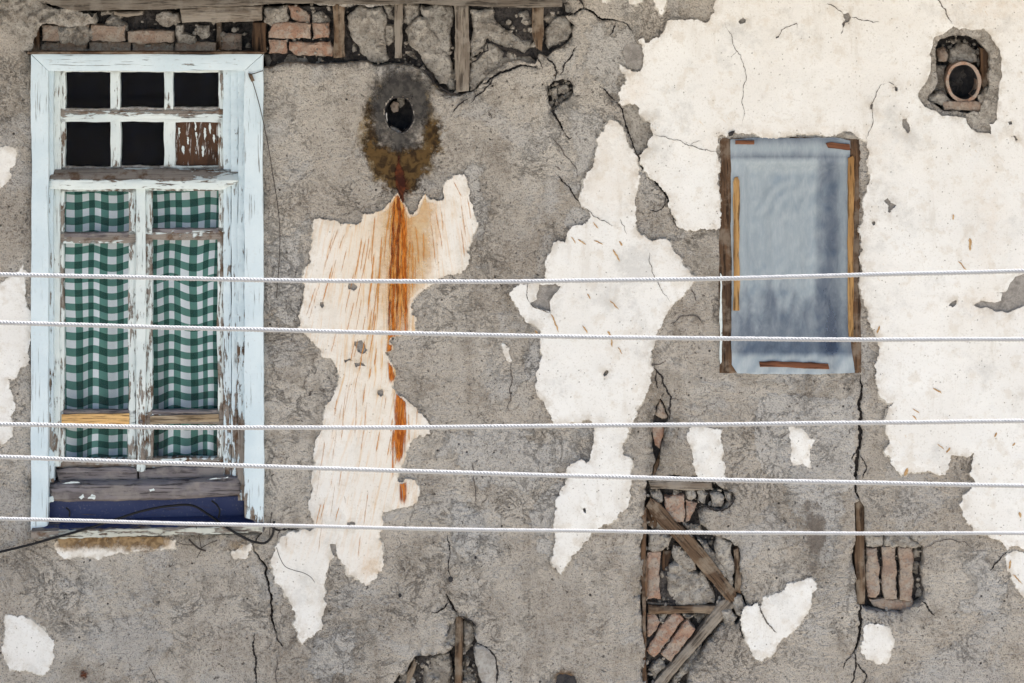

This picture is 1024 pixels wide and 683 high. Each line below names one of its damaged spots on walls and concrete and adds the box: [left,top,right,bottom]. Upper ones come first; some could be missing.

spalling [0,0,586,94]
corrosion [308,195,443,446]
peeling [509,0,1024,683]
peeling [268,173,479,645]
corrosion [376,394,410,468]
crack [851,375,867,500]
peeling [451,502,485,560]
crack [252,527,298,683]
spalling [394,615,496,683]
crack [843,604,868,683]